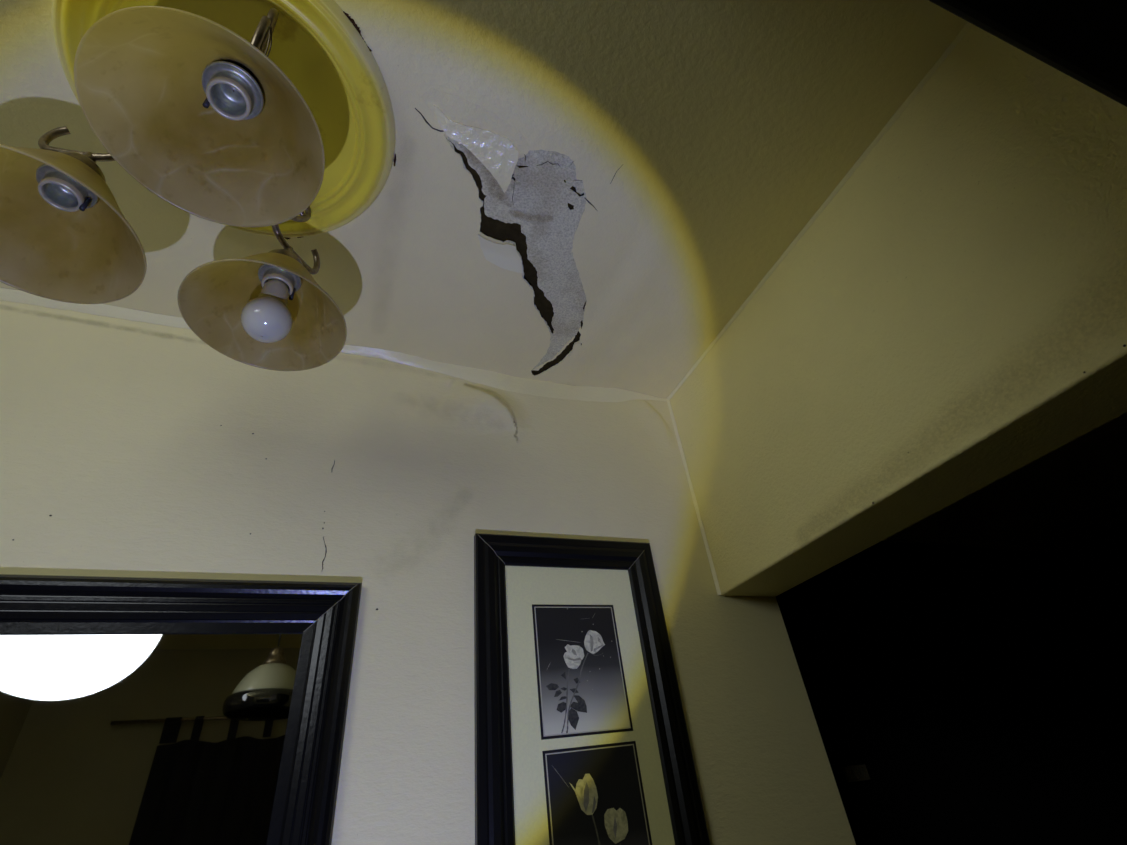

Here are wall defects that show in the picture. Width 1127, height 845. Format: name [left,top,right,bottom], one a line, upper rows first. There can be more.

peeling [420,87,586,370]